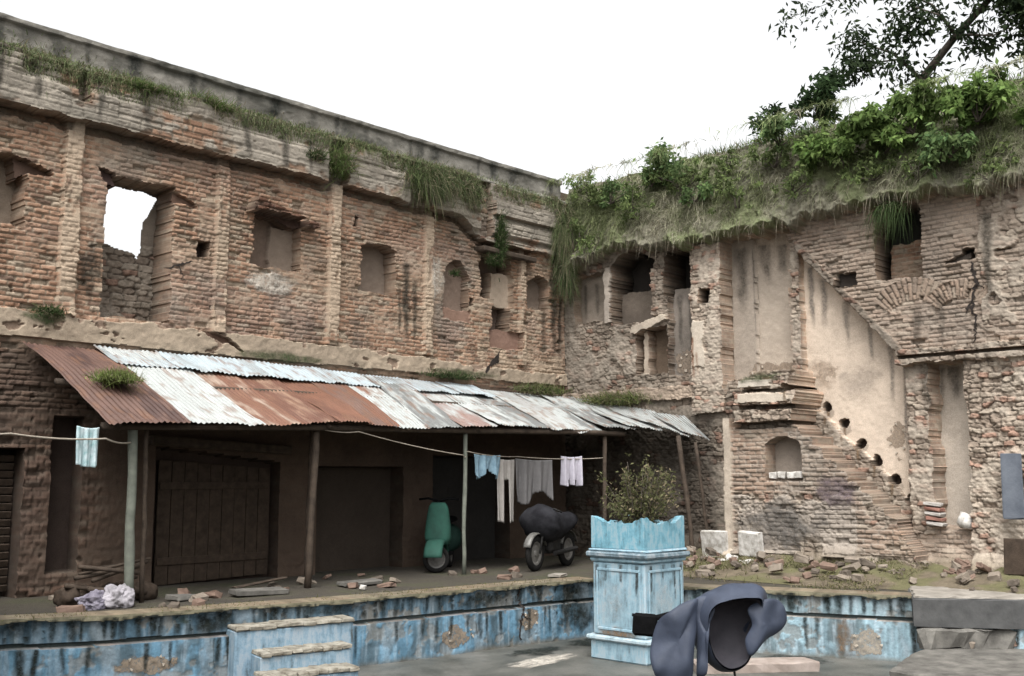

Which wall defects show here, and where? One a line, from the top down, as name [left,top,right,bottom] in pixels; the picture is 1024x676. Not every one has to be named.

damp [399,264,417,331]
crack [965,258,984,344]
spalling [114,655,178,675]
damp [253,581,594,667]
spalling [442,624,474,649]
spalling [846,629,883,656]